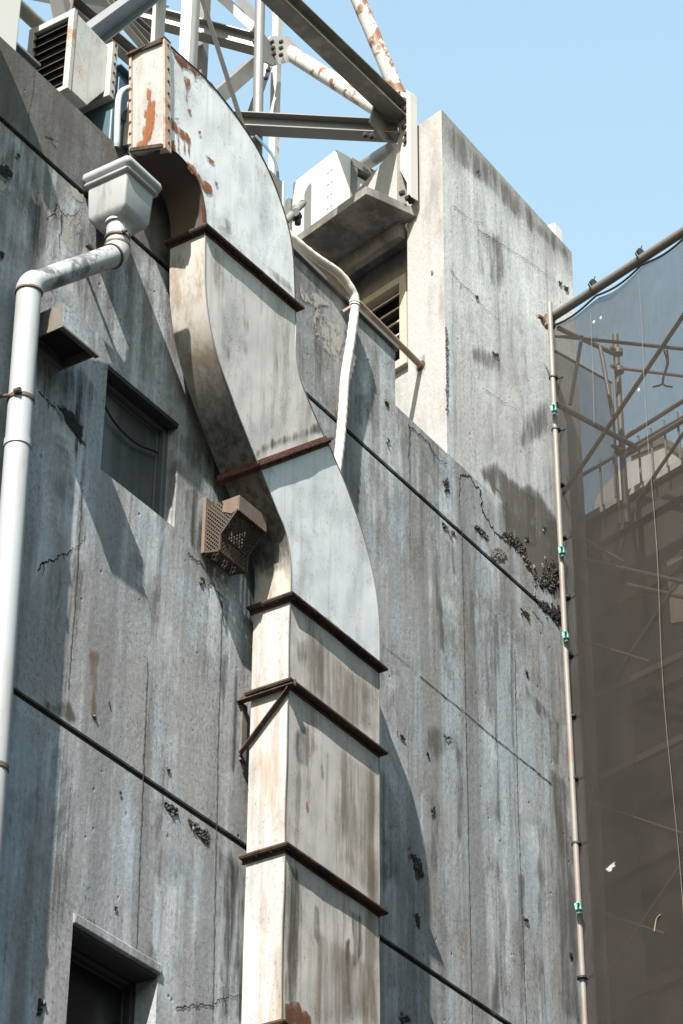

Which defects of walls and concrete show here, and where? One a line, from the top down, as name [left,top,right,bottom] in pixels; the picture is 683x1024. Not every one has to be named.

rust [137,88,155,147]
rust [171,51,218,223]
damp [453,131,516,212]
damp [191,491,202,554]
crack [37,490,85,690]
spalling [473,523,561,626]
damp [47,701,75,720]
crack [383,424,552,1024]
spalling [163,801,210,844]
crack [176,553,240,1020]
damp [552,771,577,968]
rust [285,1002,311,1024]